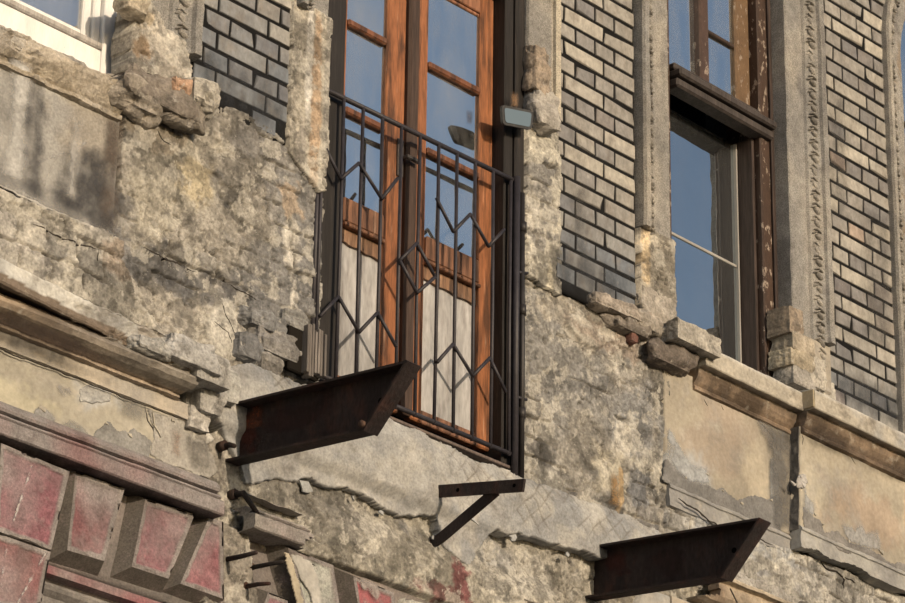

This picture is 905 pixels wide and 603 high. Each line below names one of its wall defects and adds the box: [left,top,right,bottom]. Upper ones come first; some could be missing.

damp [0,61,47,200]
damp [55,121,119,229]
spalling [0,0,635,603]
spalling [522,44,781,534]
spalling [766,306,836,400]
spalling [658,584,710,602]
spalling [735,541,905,603]
peeling [790,474,905,572]